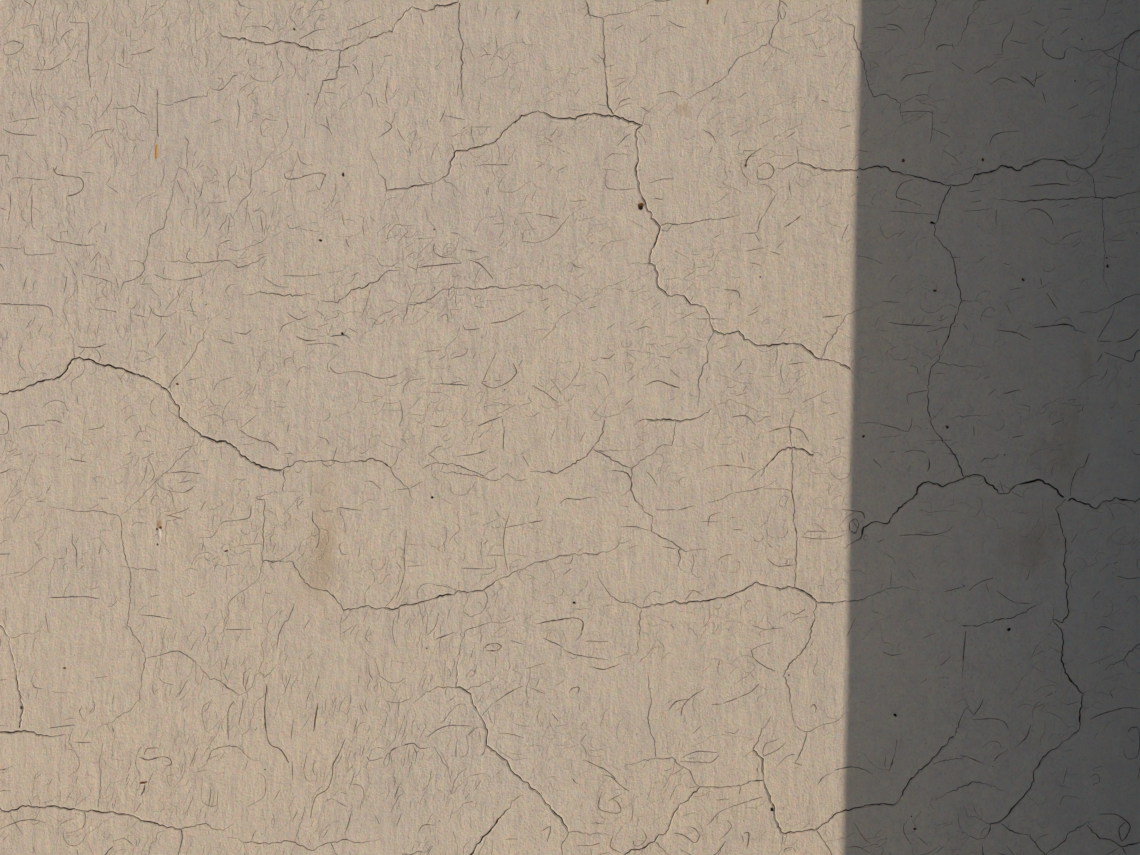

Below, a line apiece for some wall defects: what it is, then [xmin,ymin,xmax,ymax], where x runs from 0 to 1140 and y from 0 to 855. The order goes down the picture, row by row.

crack [339,55,423,111]
crack [485,36,527,92]
crack [990,73,1046,102]
crack [0,411,108,544]
crack [50,581,117,620]
crack [818,741,897,784]
crack [903,781,998,850]